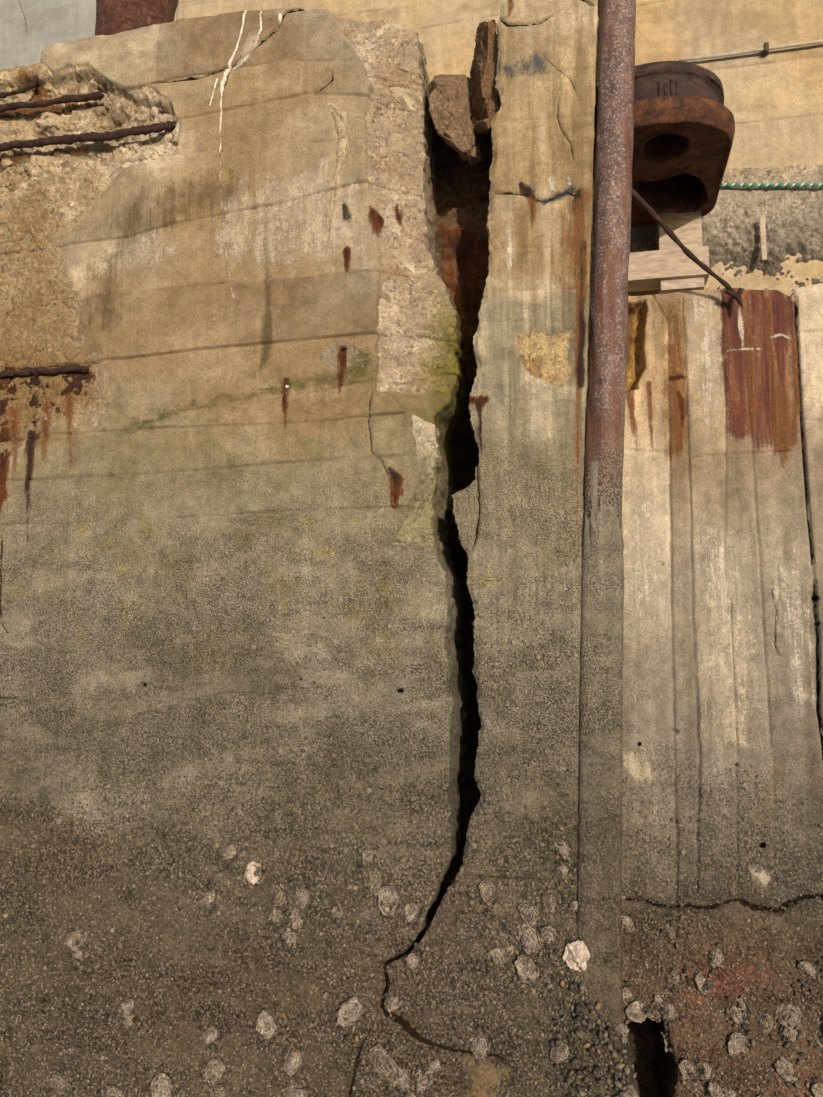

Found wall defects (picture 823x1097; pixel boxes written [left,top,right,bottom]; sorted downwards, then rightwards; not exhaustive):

spalling [0,63,180,461]
damp [115,191,175,267]
damp [207,10,366,297]
corrosion [369,204,405,232]
spalling [319,11,465,406]
corrosion [0,361,96,541]
corrosion [388,467,404,509]
spalling [394,415,443,550]
crack [380,109,573,1062]
corrosion [717,288,800,464]
crack [794,300,823,752]
crack [625,894,823,913]